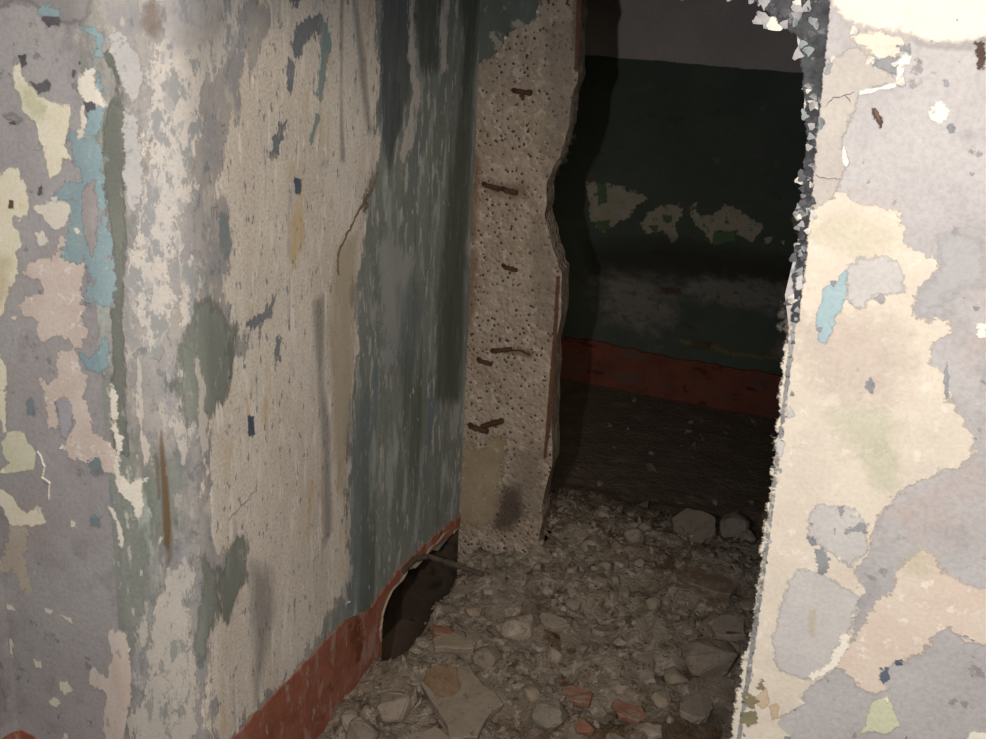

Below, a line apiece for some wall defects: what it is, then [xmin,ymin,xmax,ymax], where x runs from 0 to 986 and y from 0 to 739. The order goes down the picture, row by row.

peeling [479,0,542,62]
spalling [511,88,533,100]
spalling [481,182,518,195]
crack [337,172,378,275]
peeling [0,0,384,739]
spalling [476,347,531,366]
peeling [585,0,986,739]
spalling [467,418,504,434]
corrosion [160,444,169,548]
spalling [496,488,522,528]